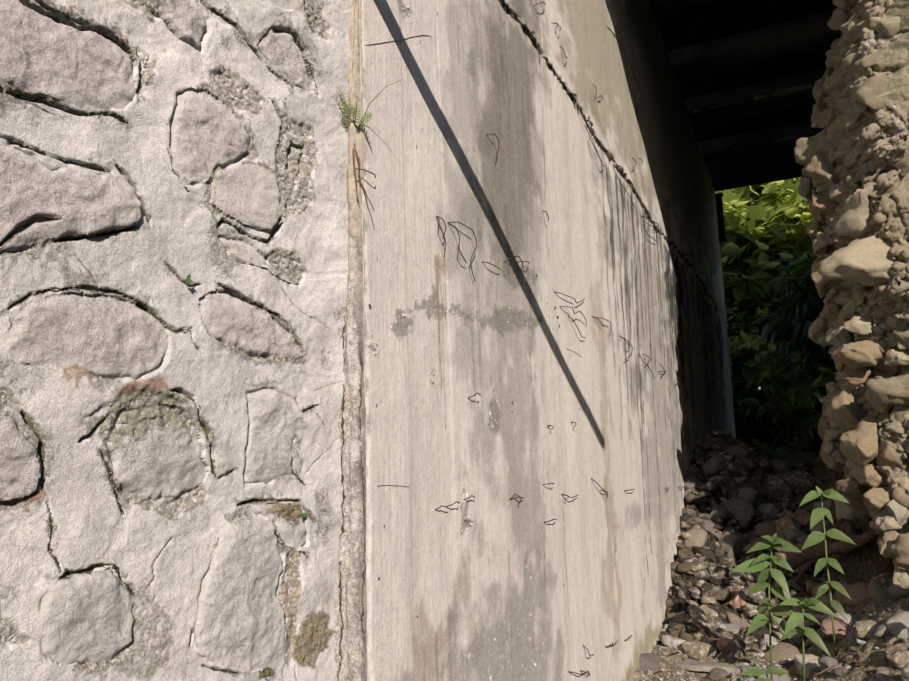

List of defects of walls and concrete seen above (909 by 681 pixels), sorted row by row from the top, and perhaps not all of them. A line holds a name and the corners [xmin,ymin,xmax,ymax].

crack [209,207,277,244]
crack [170,265,409,681]
leakage [451,0,545,445]
crack [499,0,714,303]
leakage [602,167,733,526]